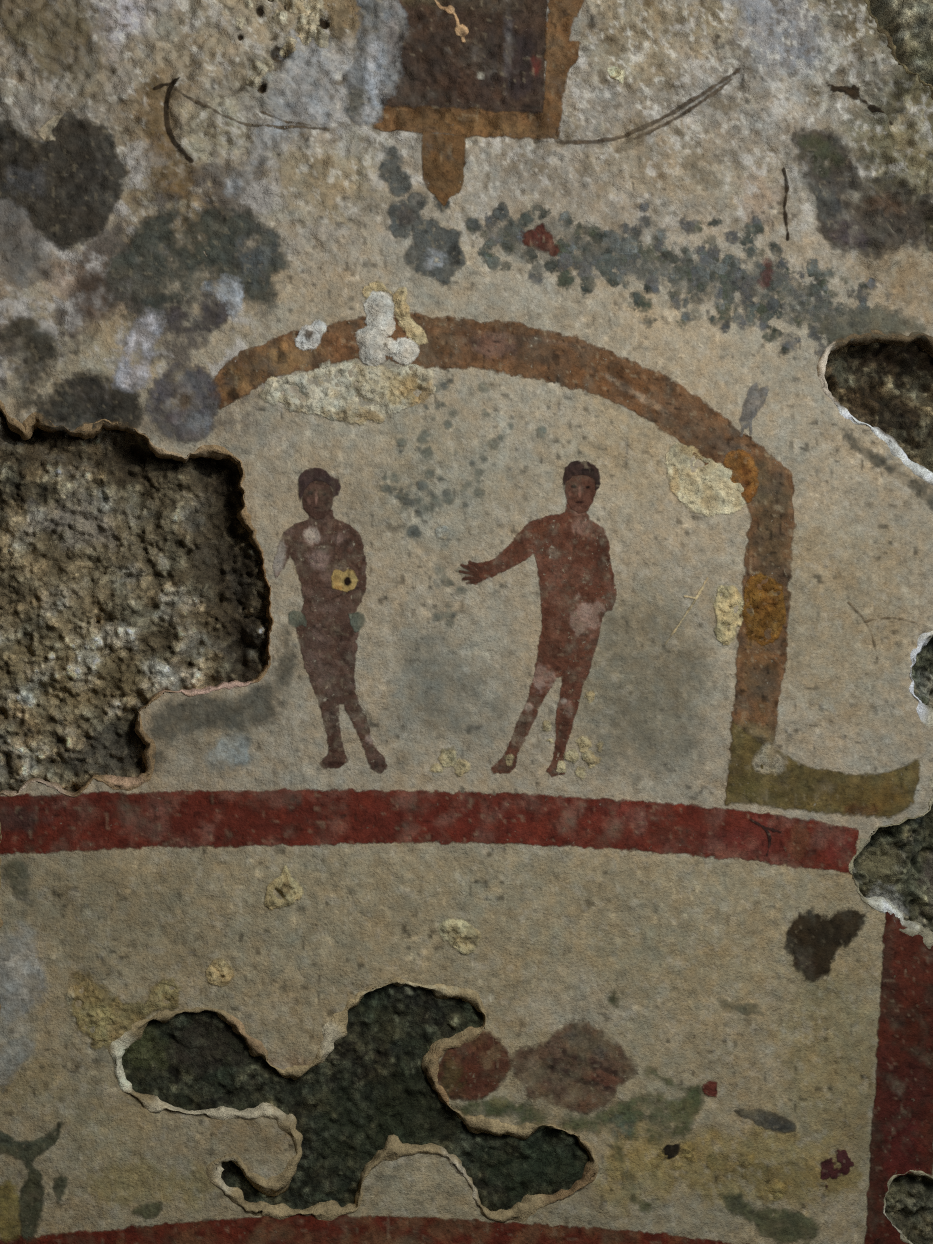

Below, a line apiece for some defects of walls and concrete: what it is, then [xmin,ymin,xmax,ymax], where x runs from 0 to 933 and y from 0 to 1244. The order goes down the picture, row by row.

water stain [227,31,330,194]
peeling [236,0,329,93]
water stain [792,130,933,259]
water stain [0,197,286,441]
flaking render [817,329,933,486]
flaking render [0,400,274,798]
flaking render [909,631,933,728]
flaking render [849,773,933,949]
peeling [206,958,235,986]
flaking render [65,972,599,1223]
flaking render [883,1170,933,1244]